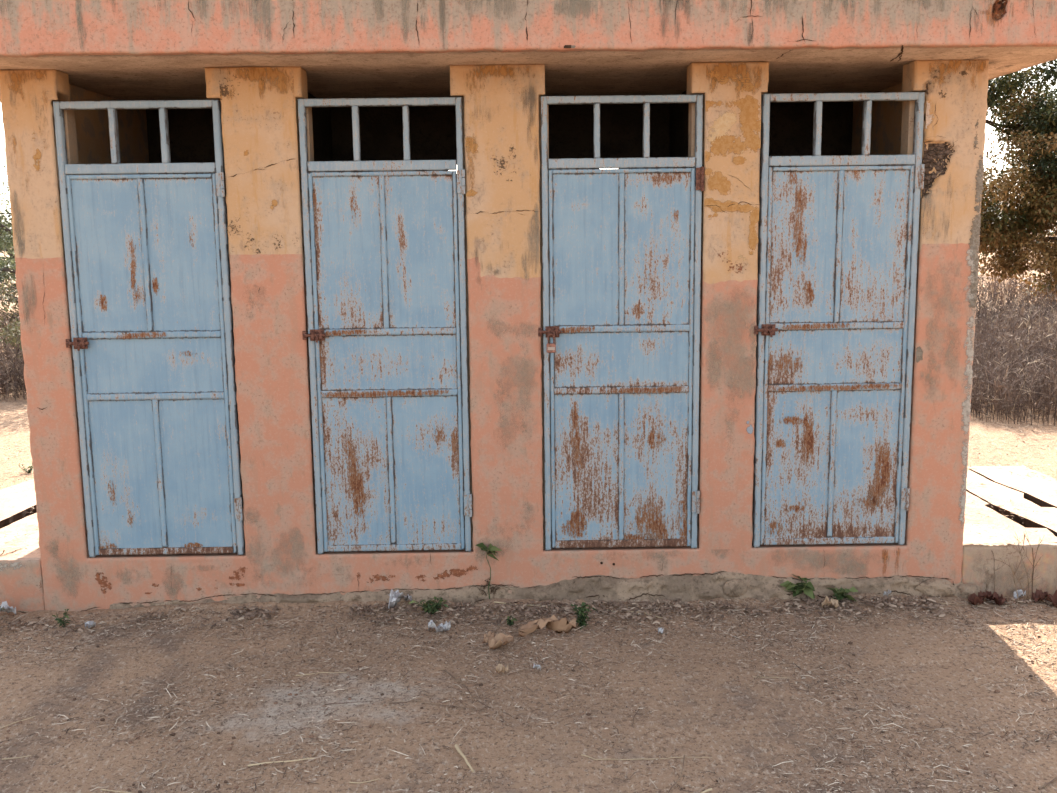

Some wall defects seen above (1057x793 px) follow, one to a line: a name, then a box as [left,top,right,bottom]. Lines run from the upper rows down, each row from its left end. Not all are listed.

spalling [992,0,1008,20]
spalling [922,81,955,198]
peeling [704,95,761,273]
corrosion [788,173,808,266]
corrosion [322,390,449,411]
corrosion [607,386,681,394]
corrosion [768,353,902,391]
corrosion [767,404,814,464]
corrosion [342,433,366,519]
corrosion [855,438,892,510]
corrosion [560,508,587,538]
corrosion [614,498,687,540]